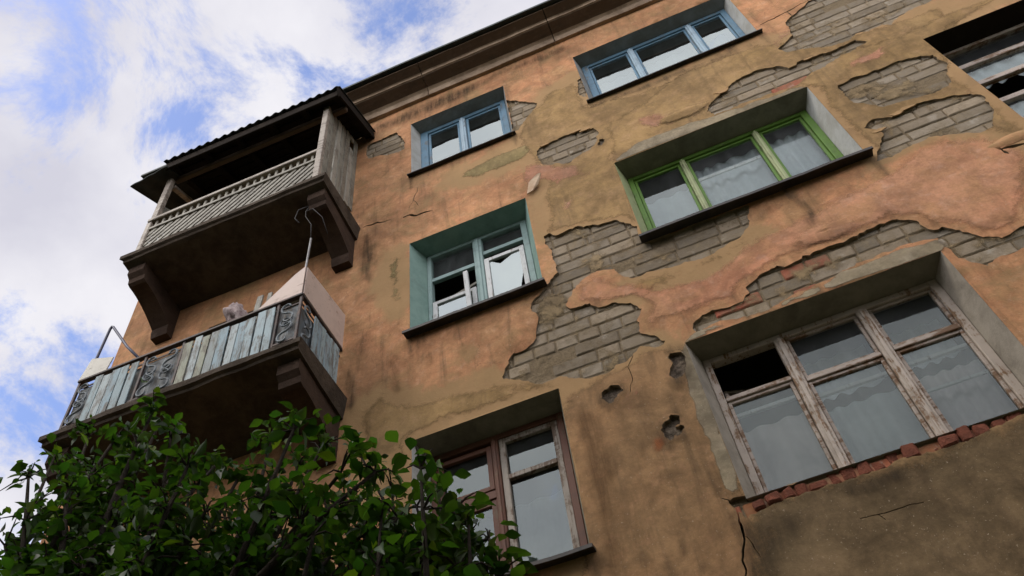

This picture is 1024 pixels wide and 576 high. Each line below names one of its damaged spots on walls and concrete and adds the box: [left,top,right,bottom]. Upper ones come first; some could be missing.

crack [363,188,433,228]
peeling [364,0,1024,576]
crack [722,498,760,576]